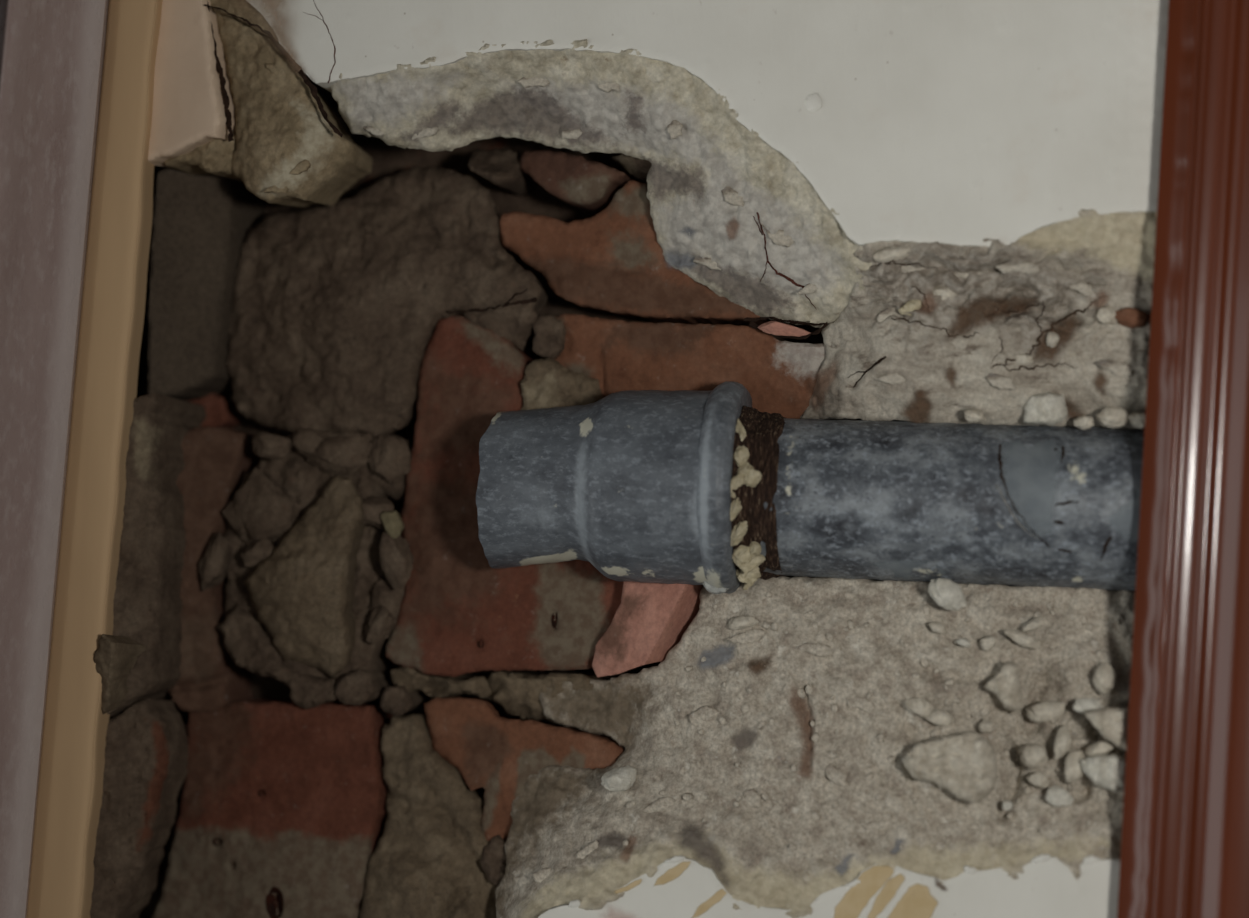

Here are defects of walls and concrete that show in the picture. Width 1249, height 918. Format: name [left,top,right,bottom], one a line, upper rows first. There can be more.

crack [204,0,343,142]
flaking render [164,0,1157,429]
spalling [243,476,368,678]
flaking render [495,576,1135,918]
spalling [265,887,284,918]